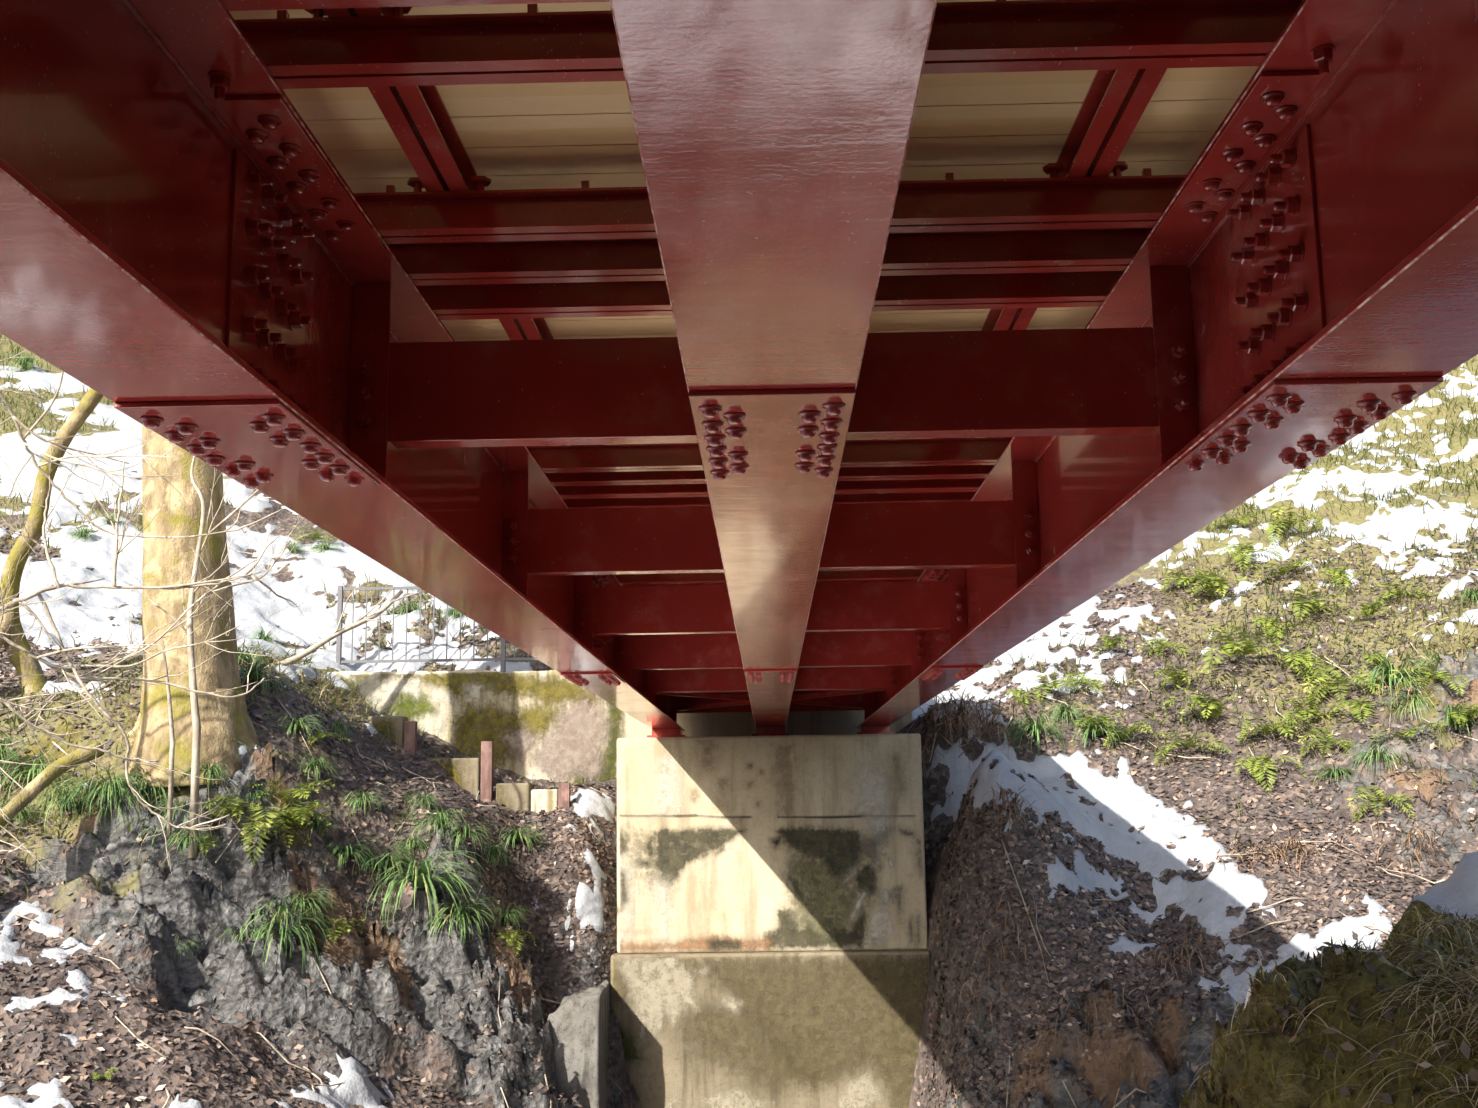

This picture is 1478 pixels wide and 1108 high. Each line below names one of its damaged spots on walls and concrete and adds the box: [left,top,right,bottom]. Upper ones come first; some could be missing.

damp [617,746,928,1108]